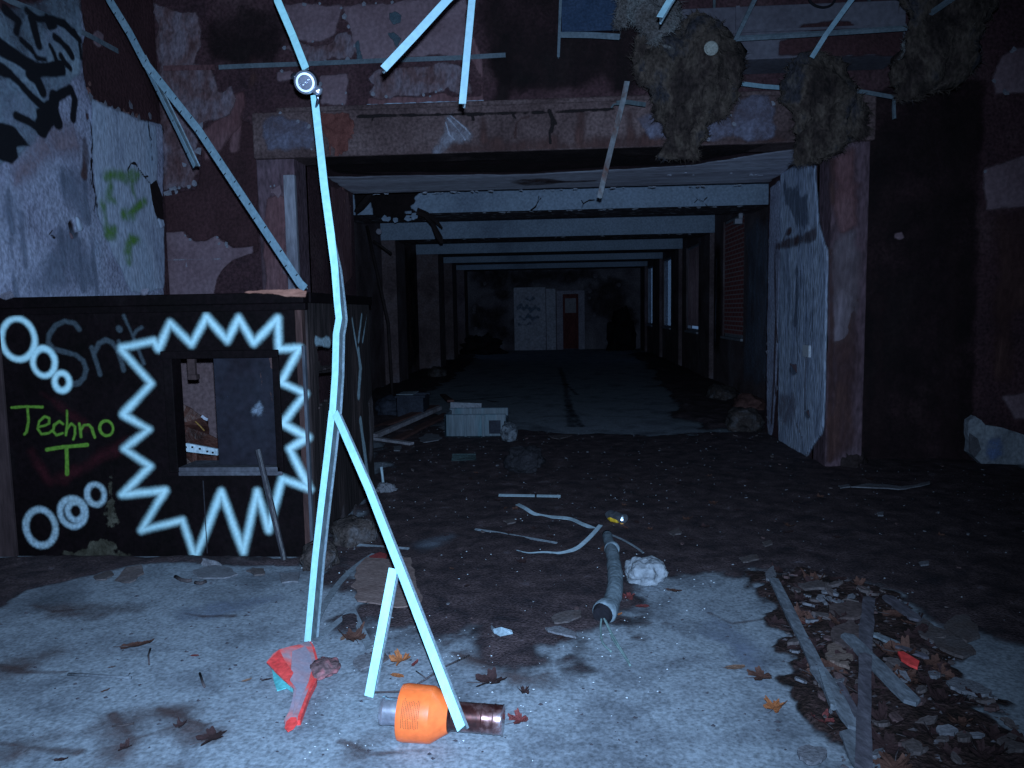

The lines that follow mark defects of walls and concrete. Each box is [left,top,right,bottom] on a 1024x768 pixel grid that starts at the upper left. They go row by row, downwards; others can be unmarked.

flaking render [0,0,315,298]
flaking render [277,0,484,105]
peeling [328,148,857,457]